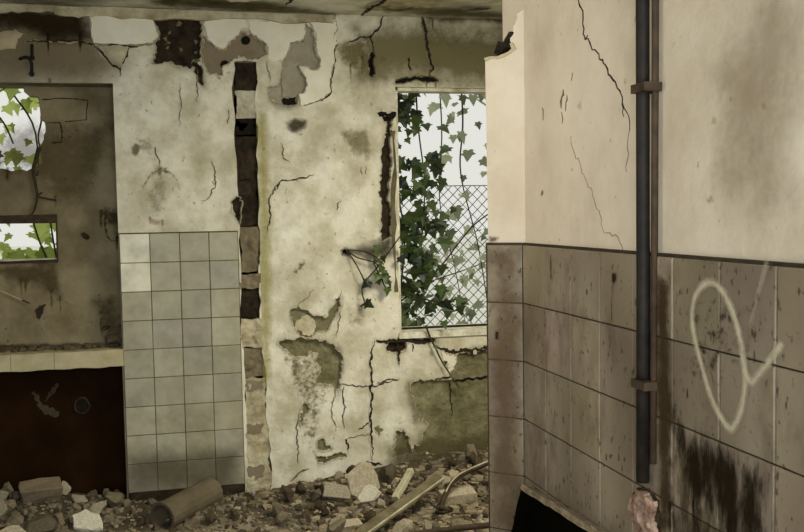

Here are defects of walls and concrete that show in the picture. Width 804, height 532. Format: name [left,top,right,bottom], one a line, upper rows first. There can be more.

crack [297,0,387,106]
crack [408,17,434,77]
crack [578,0,630,172]
crack [267,143,314,230]
crack [571,142,623,250]
flaking render [90,17,347,492]
spalling [381,337,488,457]
leakage [656,280,762,532]
spalling [627,487,660,532]